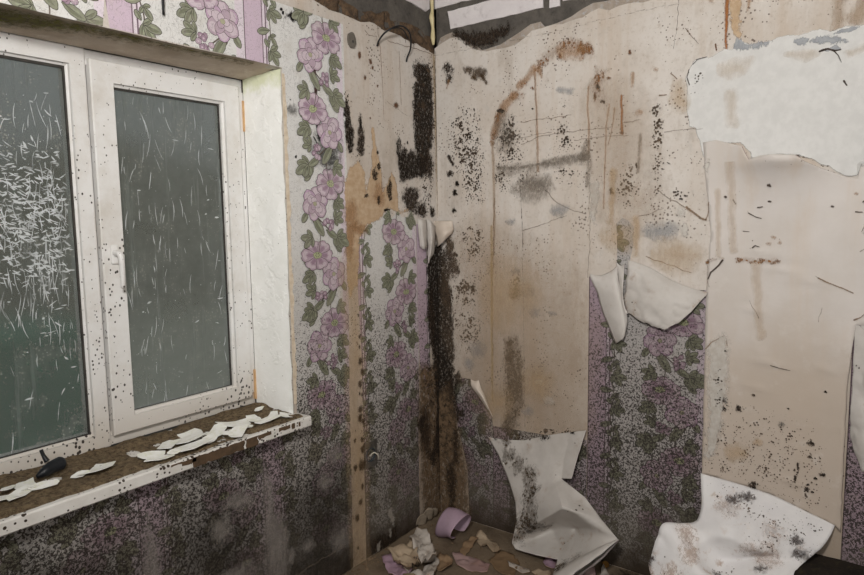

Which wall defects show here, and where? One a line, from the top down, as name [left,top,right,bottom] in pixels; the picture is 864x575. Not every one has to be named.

flaking render [314,0,650,54]
leakage [313,60,487,297]
leakage [447,105,527,204]
peeling [686,25,864,176]
peeling [590,260,708,344]
leakage [416,226,486,514]
spalling [171,422,301,468]
leakage [705,397,830,506]